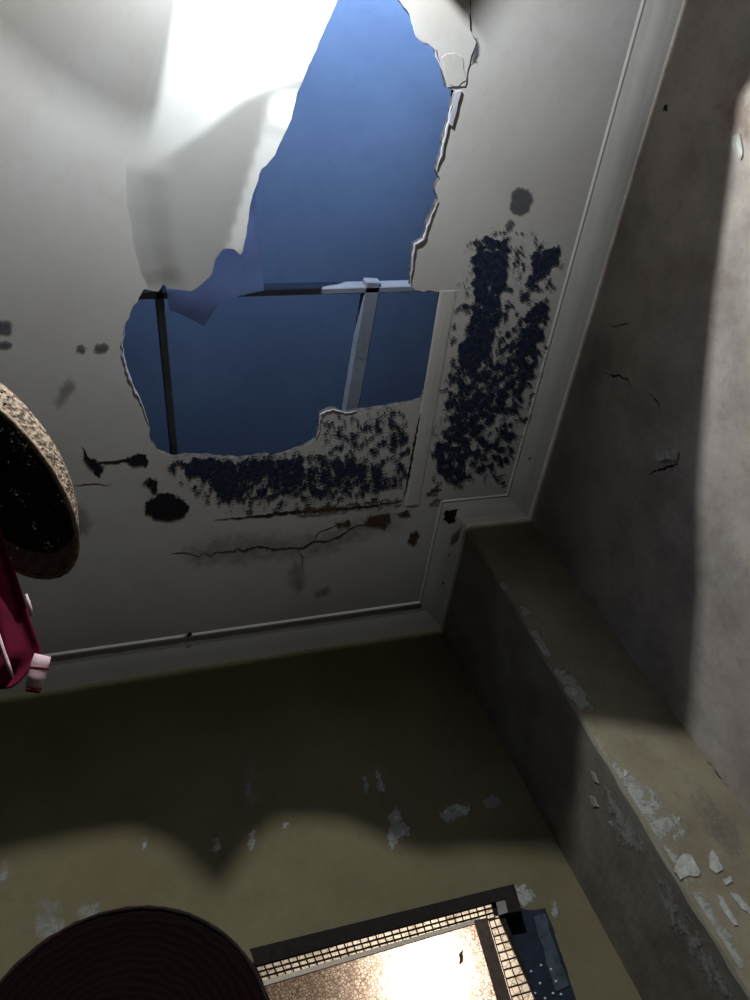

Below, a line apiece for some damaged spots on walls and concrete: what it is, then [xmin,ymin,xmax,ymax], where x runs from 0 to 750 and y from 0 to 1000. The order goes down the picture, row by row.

peeling [400,0,479,126]
water stain [430,187,562,489]
water stain [143,407,414,522]
crack [172,414,421,567]
flaking render [554,667,595,712]
peeling [386,805,412,850]
peeling [589,760,750,1000]